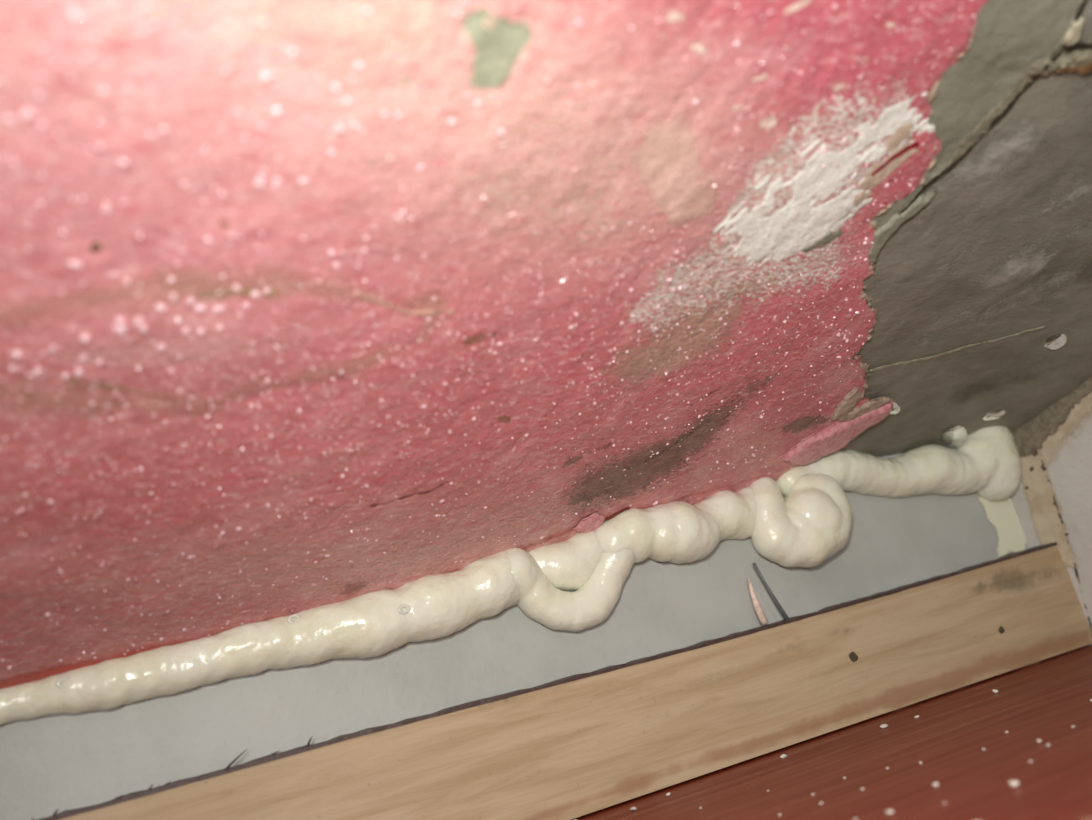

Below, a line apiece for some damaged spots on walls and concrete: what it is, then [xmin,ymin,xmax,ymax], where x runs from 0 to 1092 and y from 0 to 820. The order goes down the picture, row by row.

peeling [461,6,533,92]
peeling [618,0,1092,339]
crack [898,0,1087,215]
water stain [619,307,729,378]
spalling [870,326,1045,372]
water stain [561,375,775,517]